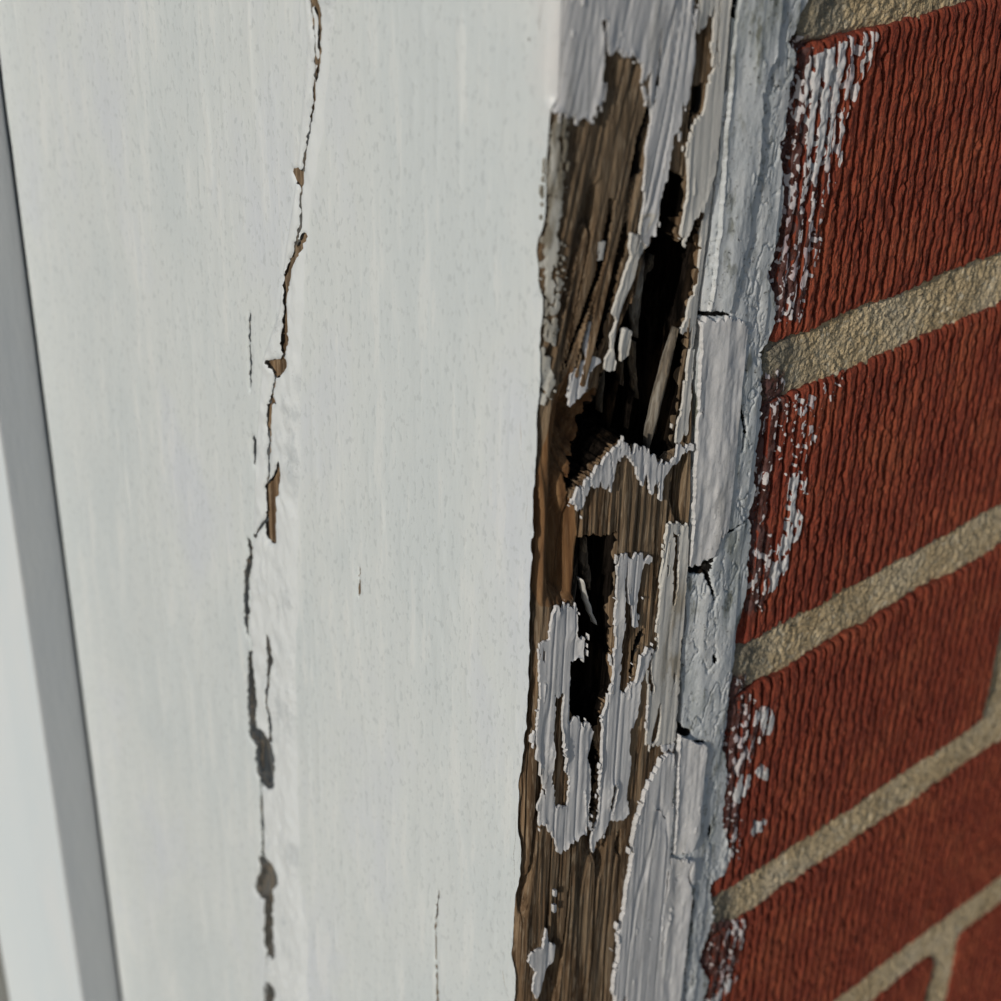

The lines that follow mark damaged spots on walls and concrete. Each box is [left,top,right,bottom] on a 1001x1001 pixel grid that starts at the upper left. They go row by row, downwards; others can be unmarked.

crack [729,0,737,19]
peeling [800,41,848,175]
peeling [538,0,732,519]
crack [244,6,321,1001]
crack [688,557,715,601]
peeling [756,707,775,735]
peeling [527,521,708,1001]
peeling [732,764,769,804]
peeling [751,819,767,836]
peeling [733,919,745,949]
peeling [705,975,738,1001]